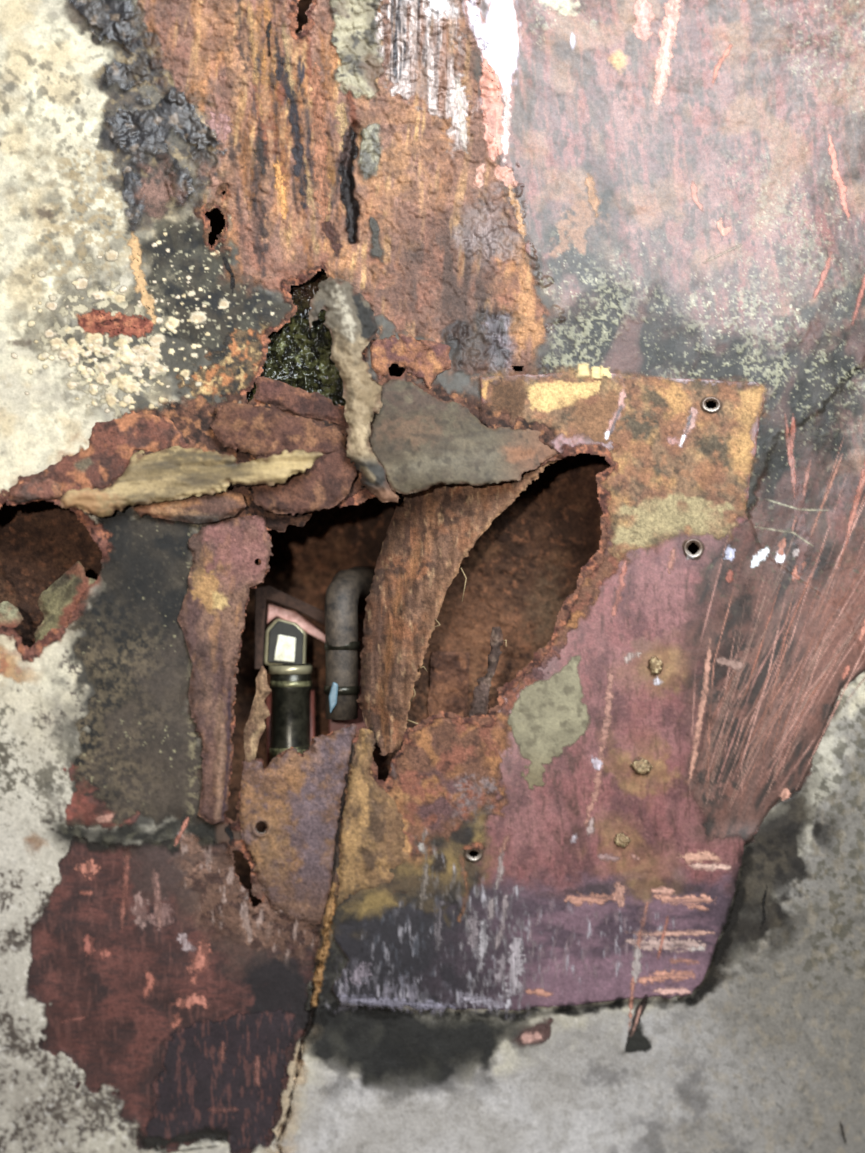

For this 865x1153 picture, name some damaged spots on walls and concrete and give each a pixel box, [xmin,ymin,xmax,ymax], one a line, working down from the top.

corrosion [77,232,156,338]
corrosion [3,328,366,532]
peeling [60,446,323,517]
peeling [308,277,401,503]
corrosion [133,0,766,1006]
corrosion [0,601,23,628]
corrosion [0,647,24,682]
corrosion [34,561,96,643]
peeling [508,656,589,789]
crack [330,744,353,898]
corrosion [272,1045,305,1153]